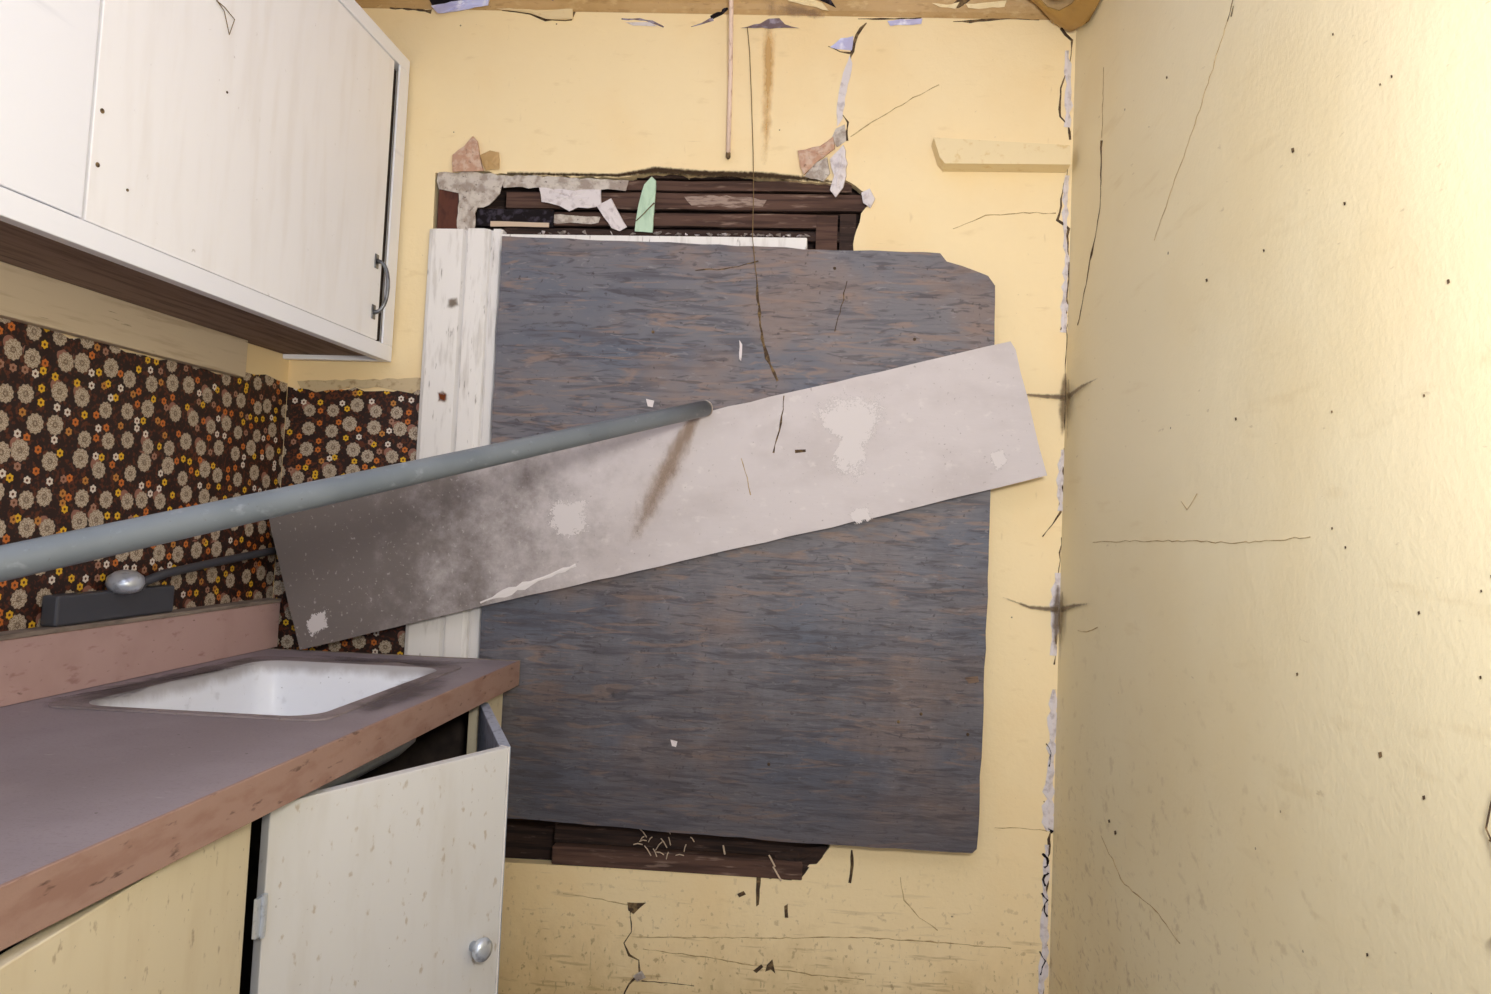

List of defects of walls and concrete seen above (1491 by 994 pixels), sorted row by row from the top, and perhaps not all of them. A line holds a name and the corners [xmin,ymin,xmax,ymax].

crack [390,6,432,14]
peeling [430,0,490,14]
crack [496,0,576,21]
crack [621,7,796,29]
spalling [788,0,836,11]
peeling [933,0,1007,9]
crack [1154,0,1234,240]
spalling [437,136,875,251]
crack [828,17,1104,380]
crack [563,422,1309,994]